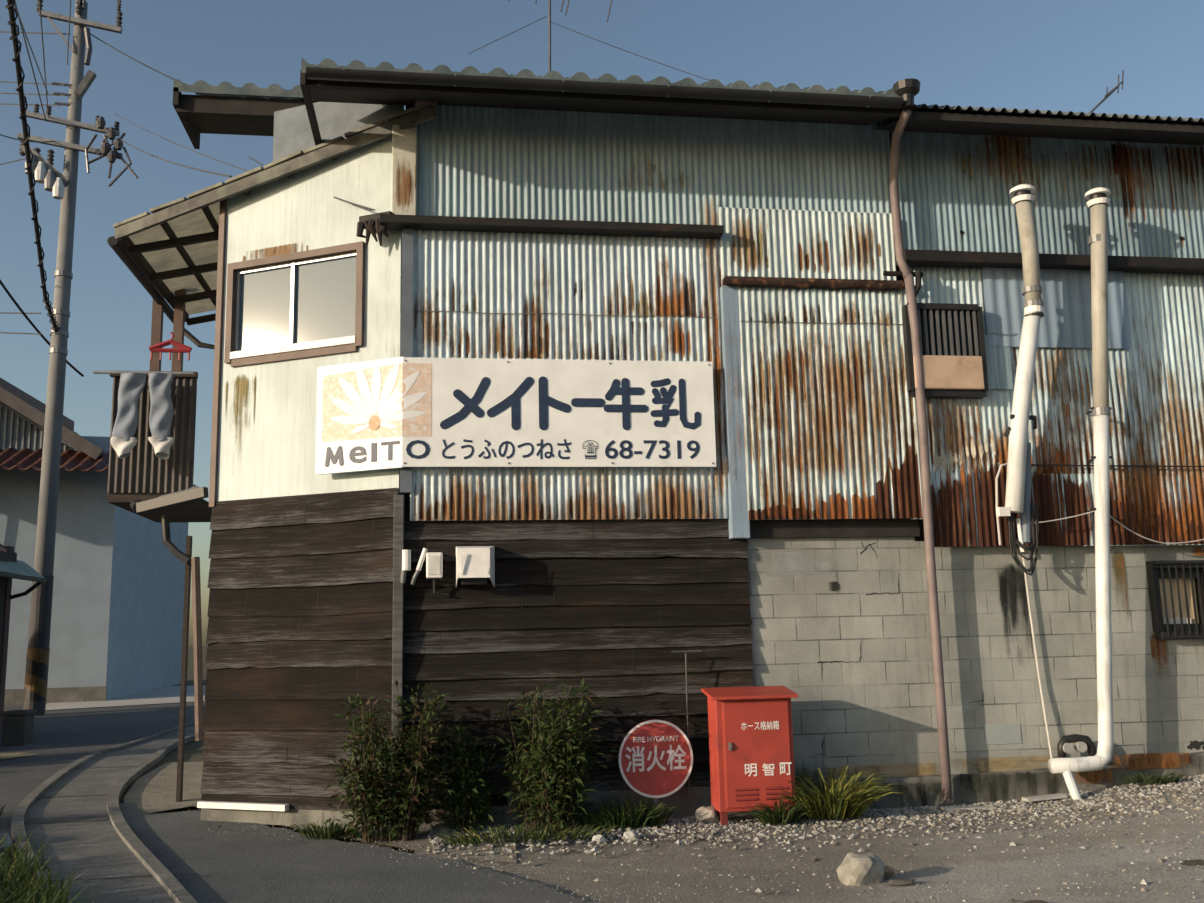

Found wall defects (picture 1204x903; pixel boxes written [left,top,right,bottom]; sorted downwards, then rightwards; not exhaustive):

corrosion [396,165,416,210]
corrosion [956,136,1204,221]
corrosion [414,198,1095,547]
corrosion [225,376,256,444]
corrosion [1109,365,1204,603]
leakage [999,566,1028,632]
corrosion [1151,635,1168,671]